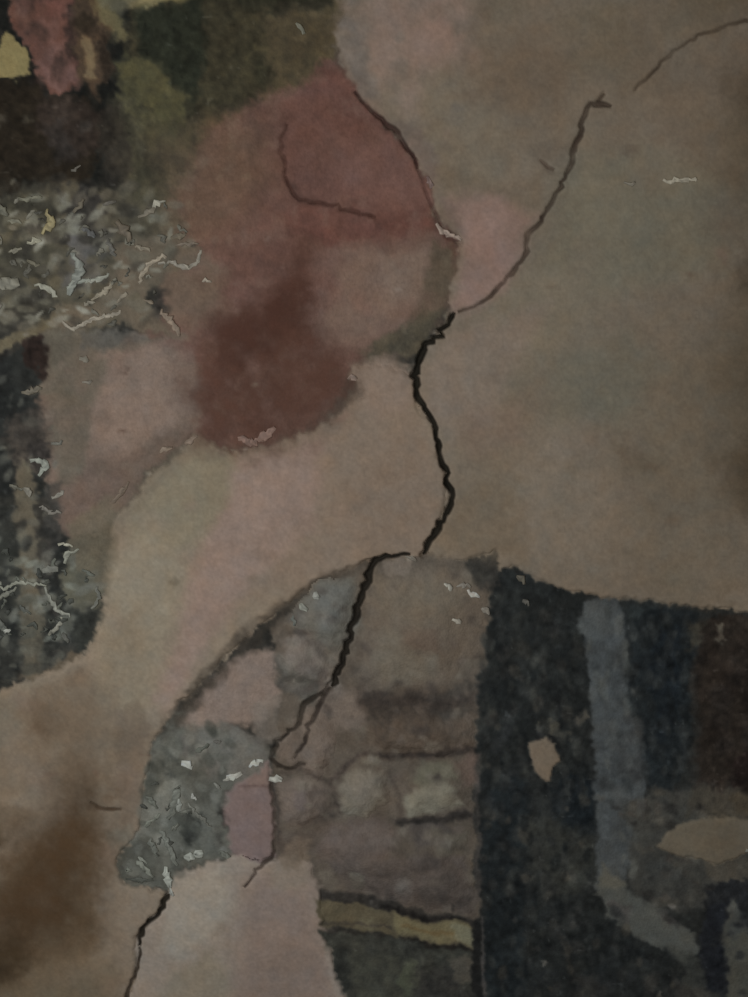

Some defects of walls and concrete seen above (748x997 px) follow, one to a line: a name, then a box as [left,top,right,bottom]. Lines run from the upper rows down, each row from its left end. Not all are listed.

crack [270,91,611,786]
crack [244,849,275,888]
crack [125,894,169,997]